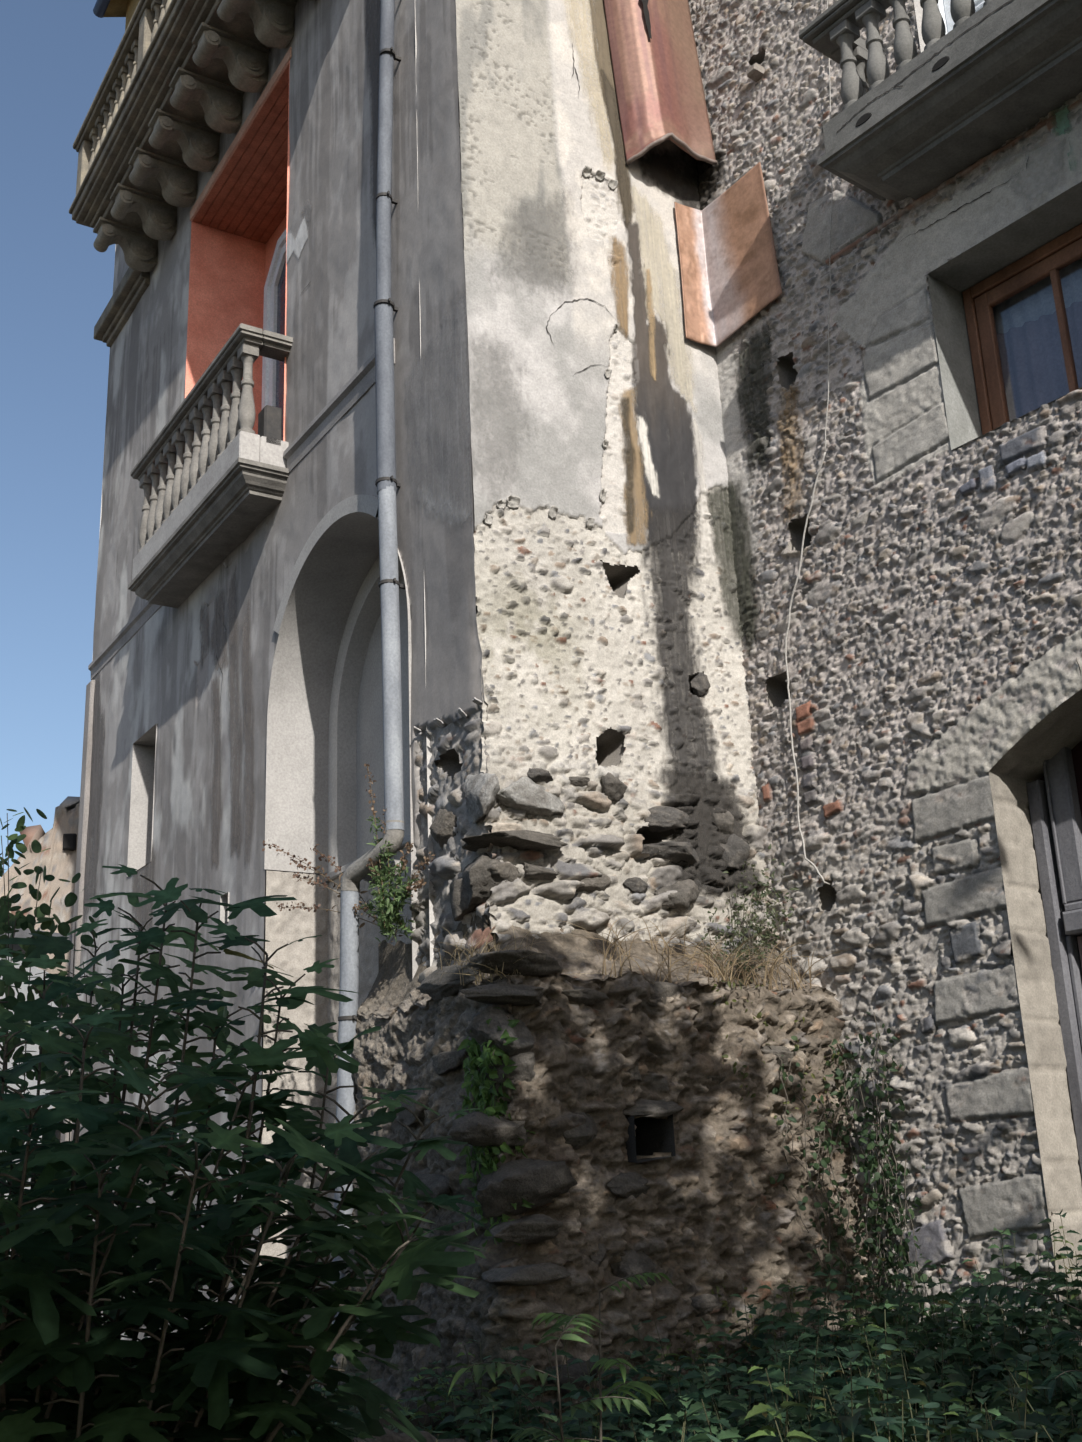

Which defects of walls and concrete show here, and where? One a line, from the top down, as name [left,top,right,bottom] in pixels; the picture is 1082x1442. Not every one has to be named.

crack [546,298,610,343]
flaking render [409,324,798,982]
leakage [570,0,773,897]